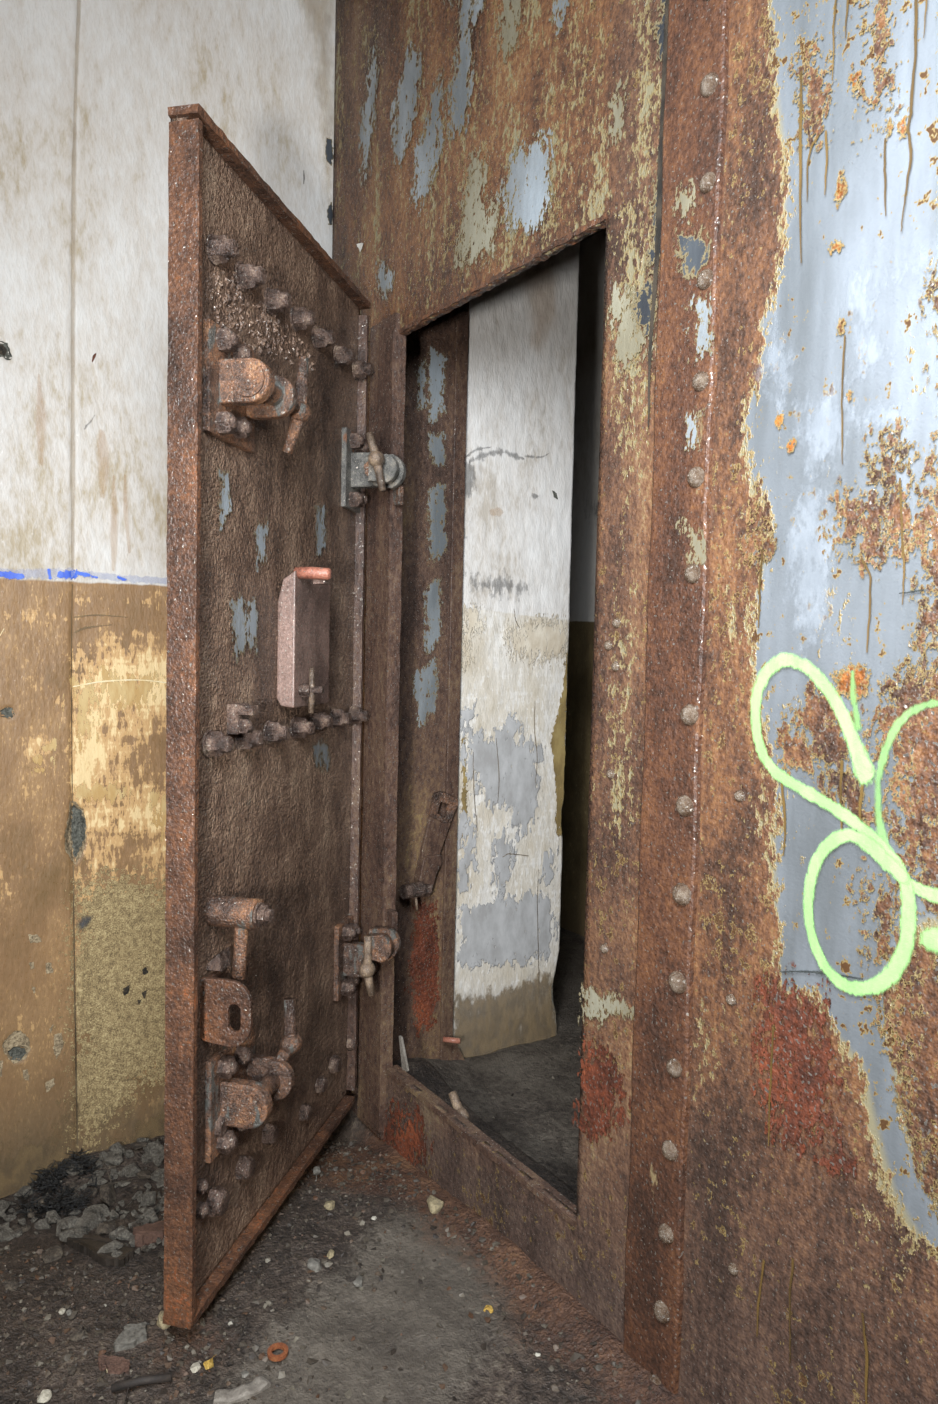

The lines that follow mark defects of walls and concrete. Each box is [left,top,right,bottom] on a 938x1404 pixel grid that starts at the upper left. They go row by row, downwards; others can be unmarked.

corrosion [787,0,927,263]
corrosion [206,268,315,372]
corrosion [737,498,785,628]
peeling [31,664,166,775]
peeling [455,602,569,973]
corrosion [404,898,442,1038]
corrosion [371,1097,434,1175]
corrosion [572,983,634,1152]
corrosion [749,963,861,1184]